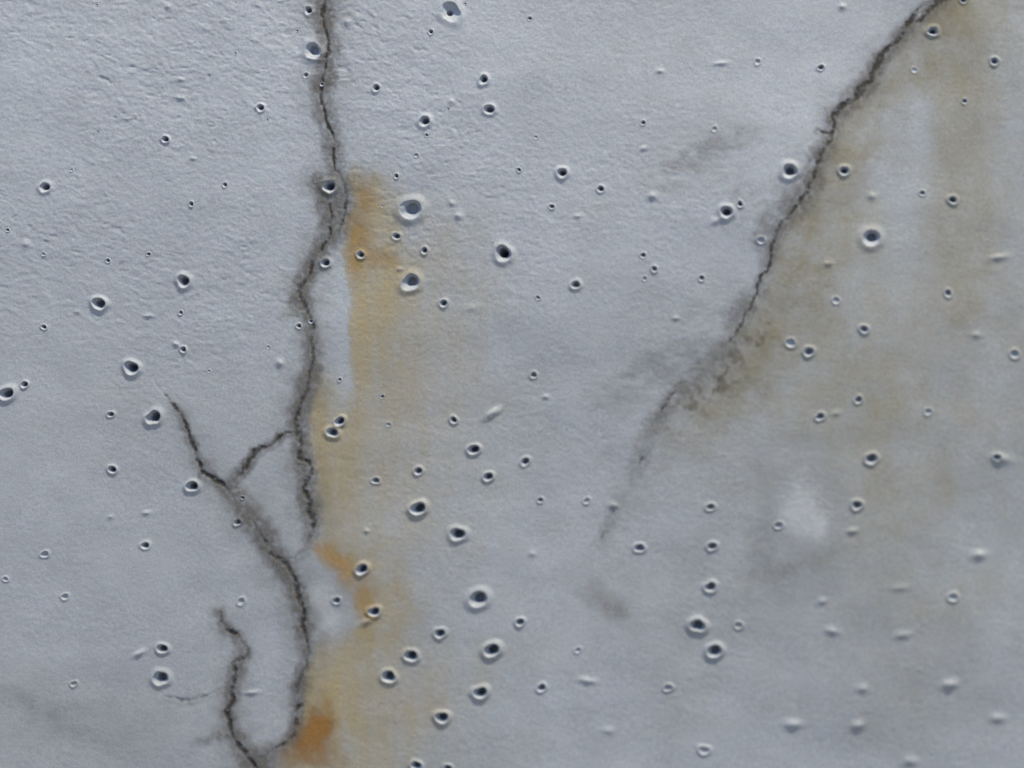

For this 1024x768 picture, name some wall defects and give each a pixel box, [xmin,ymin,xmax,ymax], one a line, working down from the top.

crack [737,0,947,331]
crack [173,0,350,768]
corrosion [295,676,341,760]